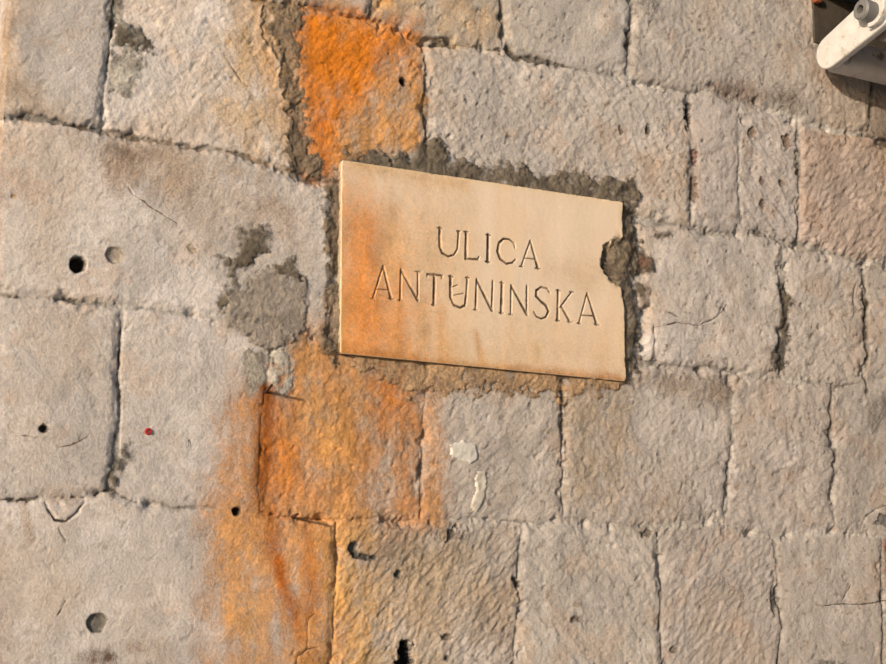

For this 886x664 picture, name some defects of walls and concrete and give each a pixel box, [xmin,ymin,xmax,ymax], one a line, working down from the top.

corrosion [170,0,626,664]
peeling [449,439,487,512]